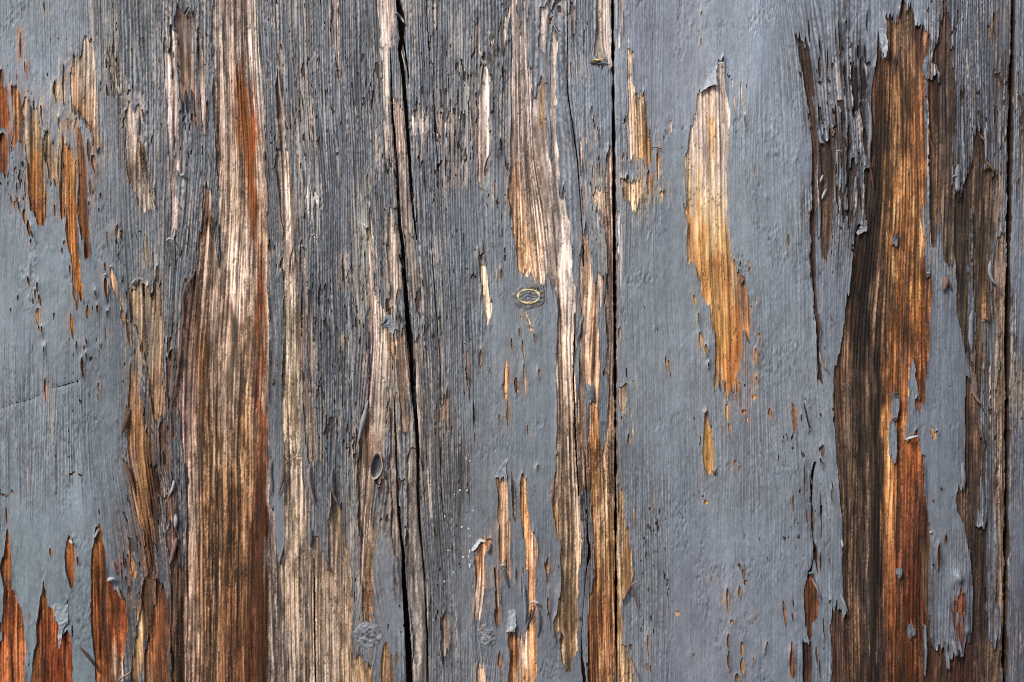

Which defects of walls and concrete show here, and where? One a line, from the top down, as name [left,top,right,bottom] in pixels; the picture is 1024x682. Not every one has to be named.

peeling [0,0,665,682]
crack [390,0,444,682]
peeling [683,57,761,478]
peeling [721,563,754,682]
peeling [783,0,1007,682]